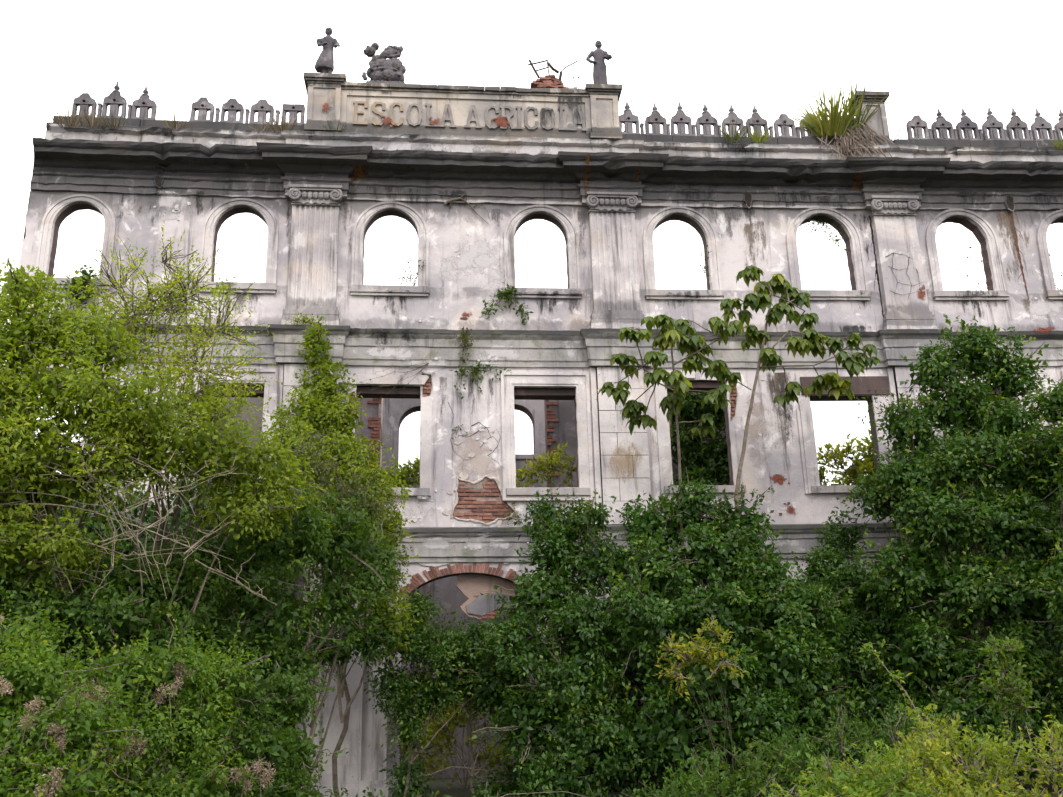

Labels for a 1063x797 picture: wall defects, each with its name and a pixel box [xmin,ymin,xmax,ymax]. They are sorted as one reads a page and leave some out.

water stain [677,189,766,267]
water stain [774,191,868,229]
crack [868,216,920,323]
rust [998,212,1029,274]
water stain [767,372,796,439]
spalling [403,472,520,527]
peeling [423,536,450,549]
peeling [464,539,509,550]
spalling [398,562,526,596]
peeling [466,593,517,623]